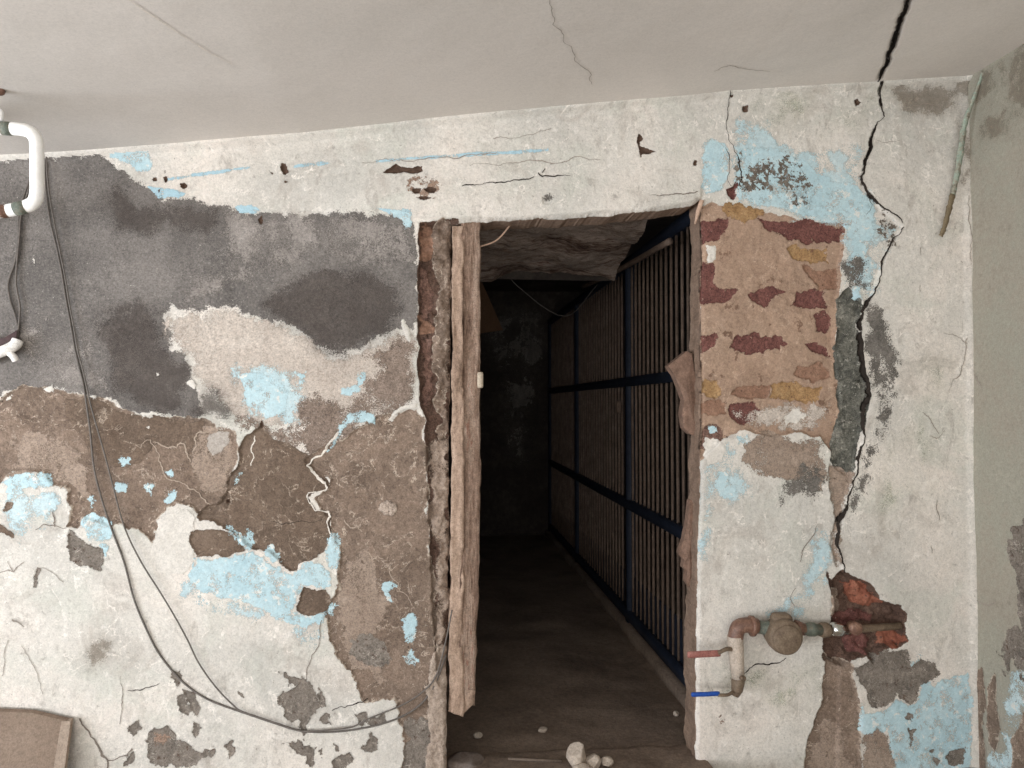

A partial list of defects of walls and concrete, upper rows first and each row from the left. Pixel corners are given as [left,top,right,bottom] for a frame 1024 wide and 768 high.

damp [0,154,421,429]
spalling [383,164,423,174]
spalling [412,187,436,200]
crack [362,128,600,186]
crack [549,0,592,84]
flaking render [699,181,847,466]
crack [800,0,921,573]
spalling [0,208,459,768]
spalling [804,464,941,768]
spalling [929,747,966,766]
spalling [977,518,1024,768]